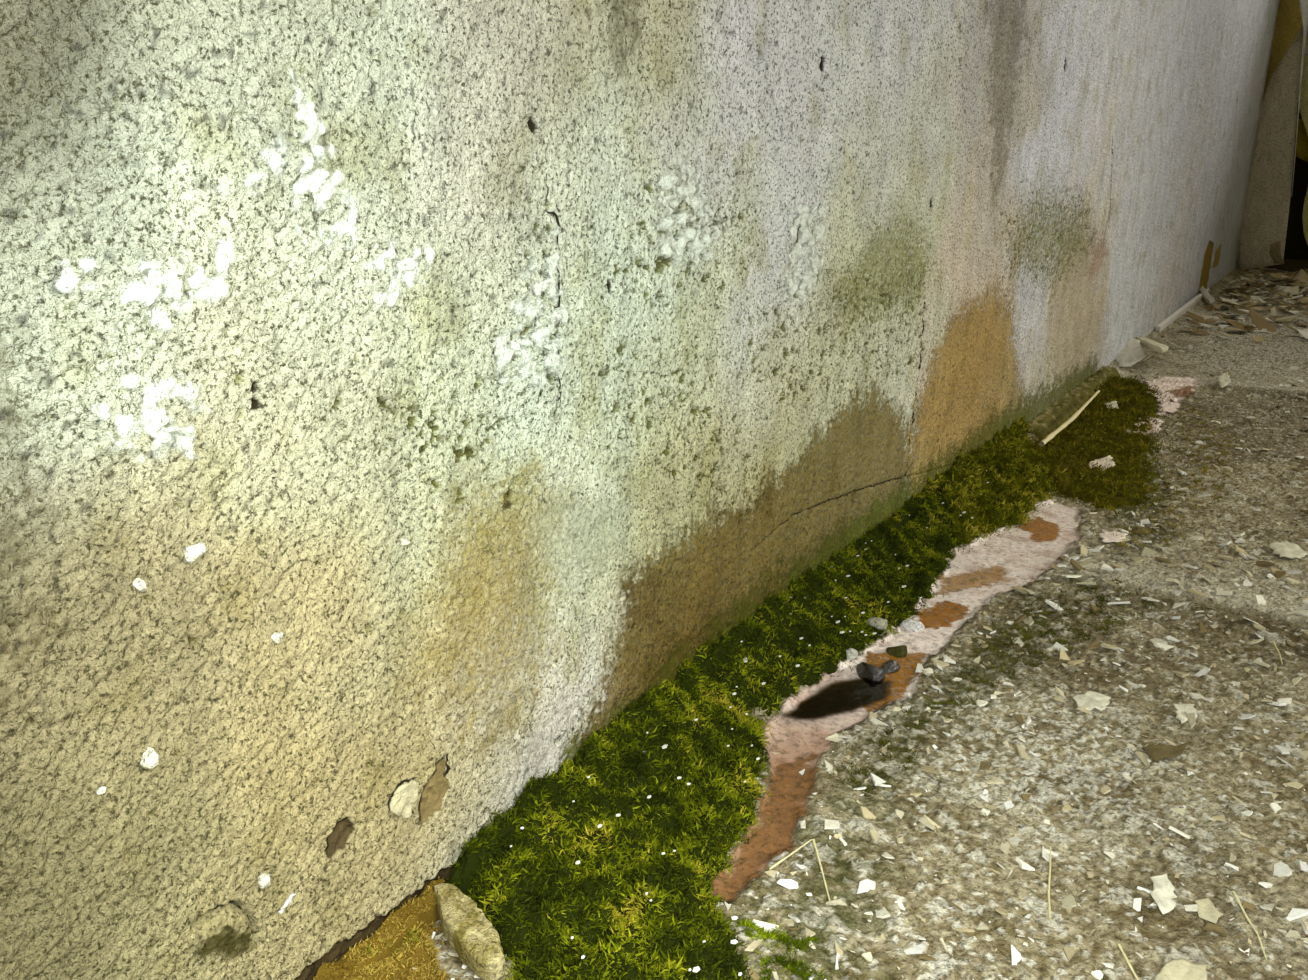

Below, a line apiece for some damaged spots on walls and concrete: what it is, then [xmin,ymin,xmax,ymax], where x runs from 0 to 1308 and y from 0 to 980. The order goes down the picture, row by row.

damp [575,276,1027,747]
crack [751,301,944,550]
damp [428,464,618,809]
spalling [326,817,355,858]
spalling [294,864,455,980]
spalling [388,754,451,825]